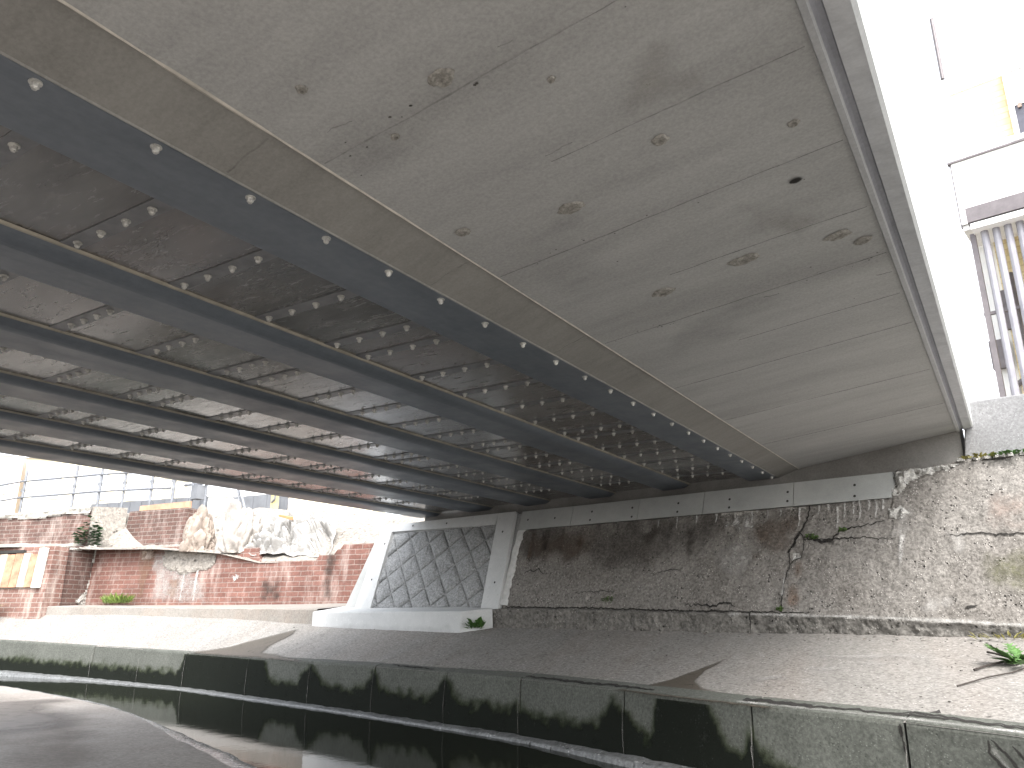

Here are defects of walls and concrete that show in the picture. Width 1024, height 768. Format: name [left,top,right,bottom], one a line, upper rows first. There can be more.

spalling [823,229,873,245]
spalling [888,463,959,520]
crack [951,530,1024,538]
crack [505,506,893,633]